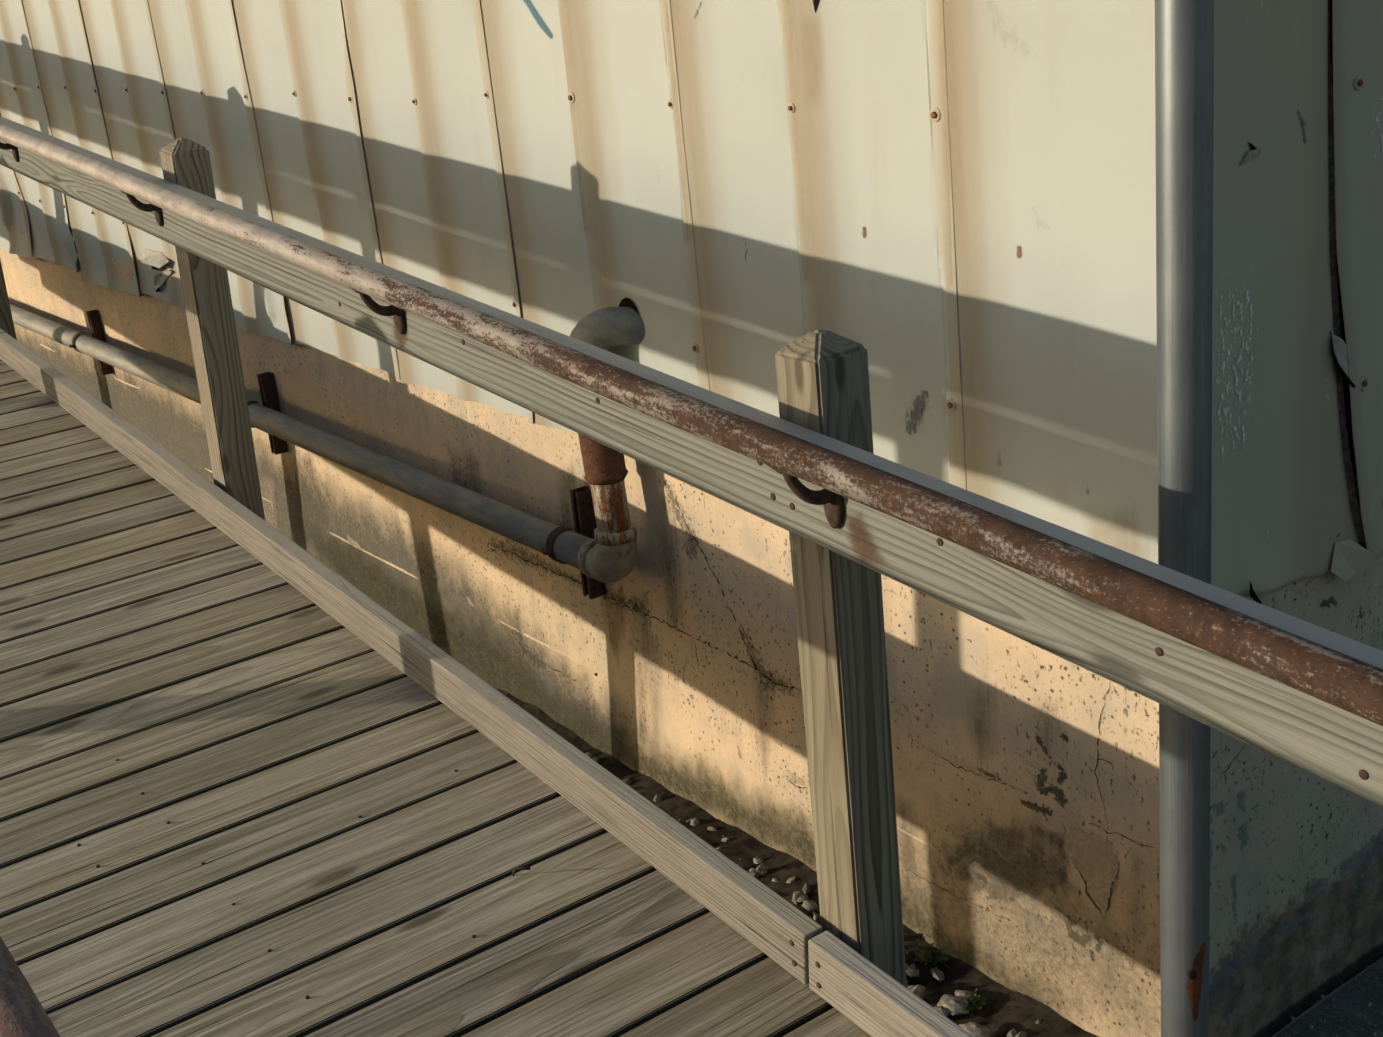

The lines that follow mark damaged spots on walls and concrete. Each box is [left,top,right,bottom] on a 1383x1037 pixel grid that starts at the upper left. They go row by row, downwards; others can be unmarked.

water stain [16,333,214,483]
water stain [256,450,627,752]
crack [488,486,801,693]
corrosion [850,521,877,561]
crack [1085,681,1155,848]
water stain [899,826,1143,1014]
corrosion [1187,943,1205,1020]